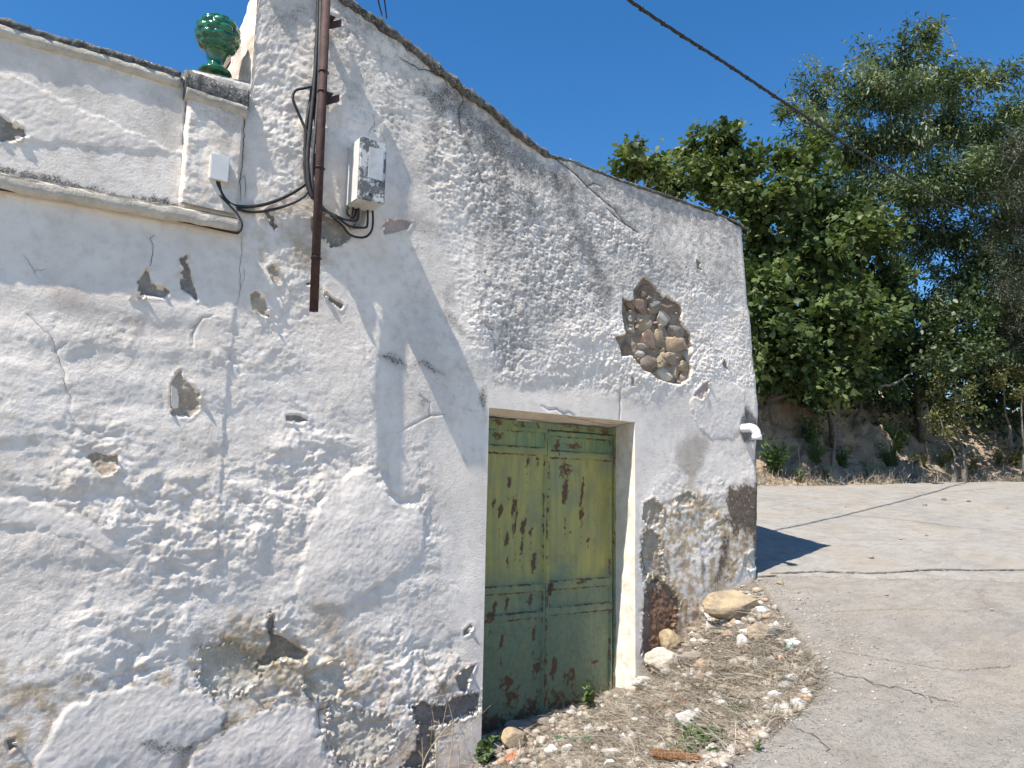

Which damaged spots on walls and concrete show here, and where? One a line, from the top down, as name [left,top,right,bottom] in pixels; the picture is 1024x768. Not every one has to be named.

spalling [0,116,25,143]
crack [554,158,635,231]
peeling [382,217,411,234]
spalling [129,255,197,301]
spalling [250,291,271,317]
spalling [616,279,693,386]
spalling [169,370,203,417]
spalling [88,452,119,475]
spalling [675,492,696,506]
spalling [640,499,679,672]
spalling [196,611,400,768]
spalling [399,665,480,768]